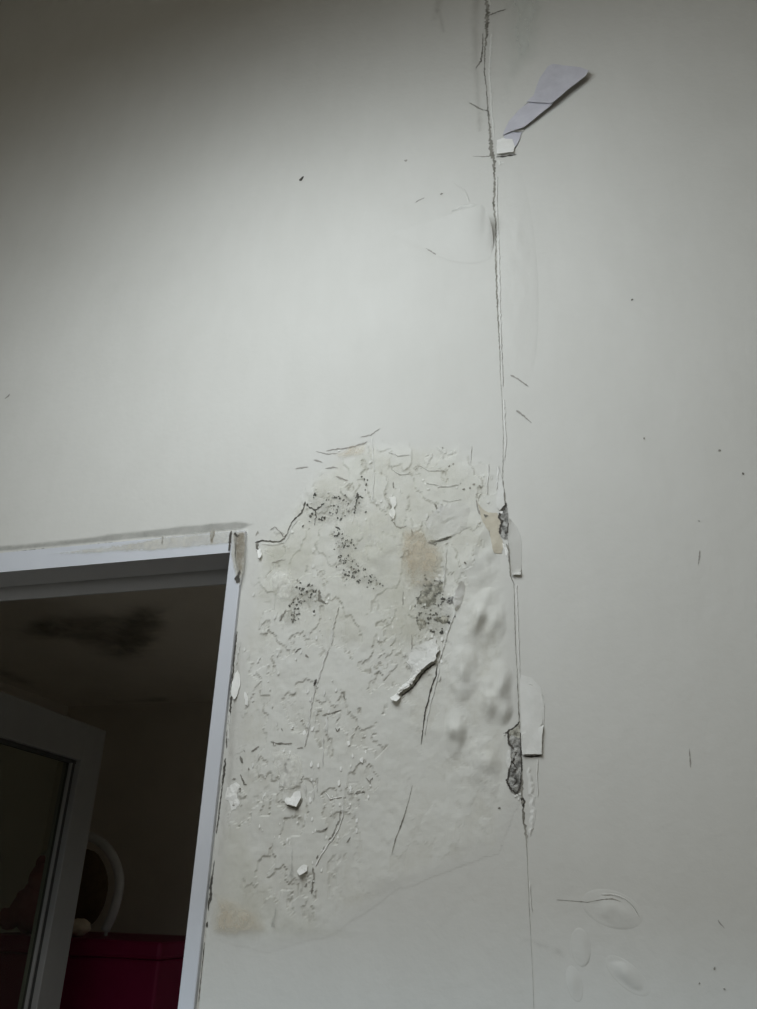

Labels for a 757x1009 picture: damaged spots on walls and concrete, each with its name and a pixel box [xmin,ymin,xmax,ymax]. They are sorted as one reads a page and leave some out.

peeling [496,138,517,165]
crack [470,0,507,507]
peeling [216,634,259,833]
peeling [271,574,340,767]
peeling [278,757,344,894]
leakage [291,476,383,589]
crack [392,788,412,852]
crack [421,667,441,742]
flaking render [388,463,522,701]
crack [507,538,521,729]
flaking render [504,721,525,806]
crack [520,753,536,1000]